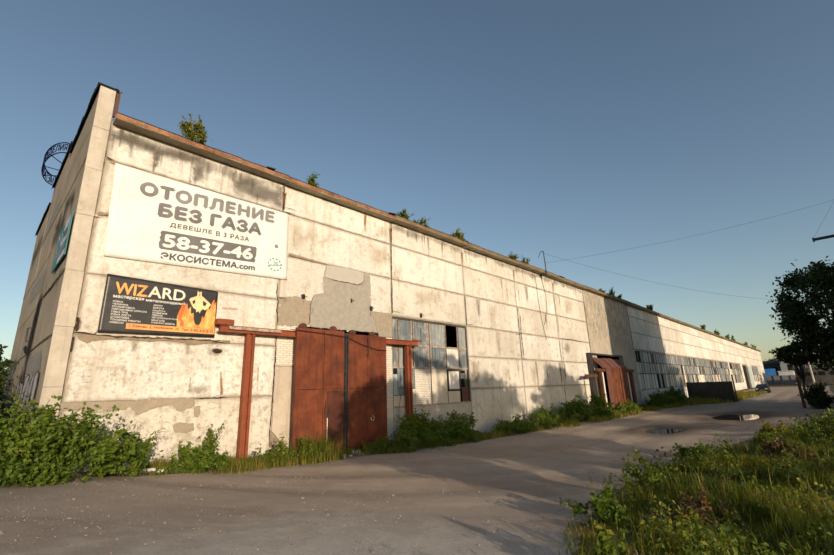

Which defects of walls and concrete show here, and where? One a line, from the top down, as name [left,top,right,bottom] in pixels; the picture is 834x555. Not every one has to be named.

damp [32,193,74,267]
peeling [278,252,392,338]
peeling [60,397,200,433]